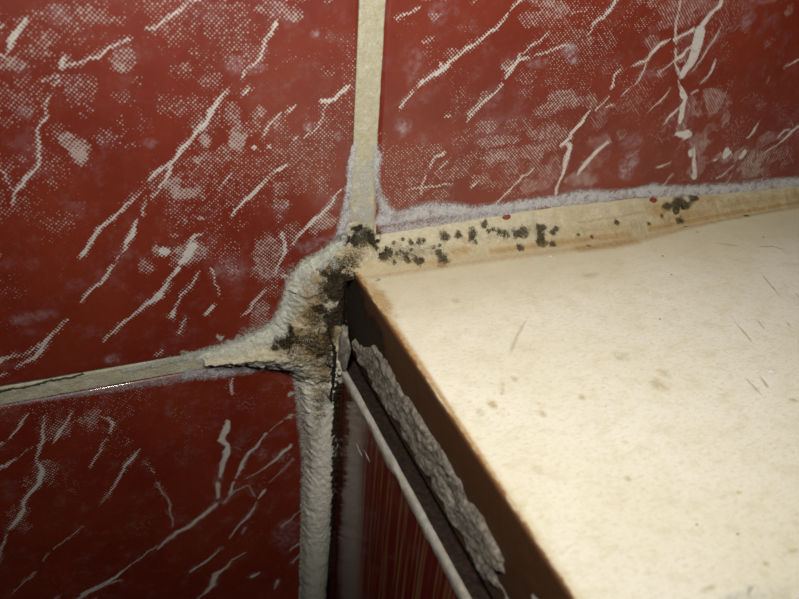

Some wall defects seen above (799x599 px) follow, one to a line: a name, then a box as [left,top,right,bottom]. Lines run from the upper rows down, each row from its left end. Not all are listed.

water stain [648,195,699,230]
water stain [267,219,559,578]